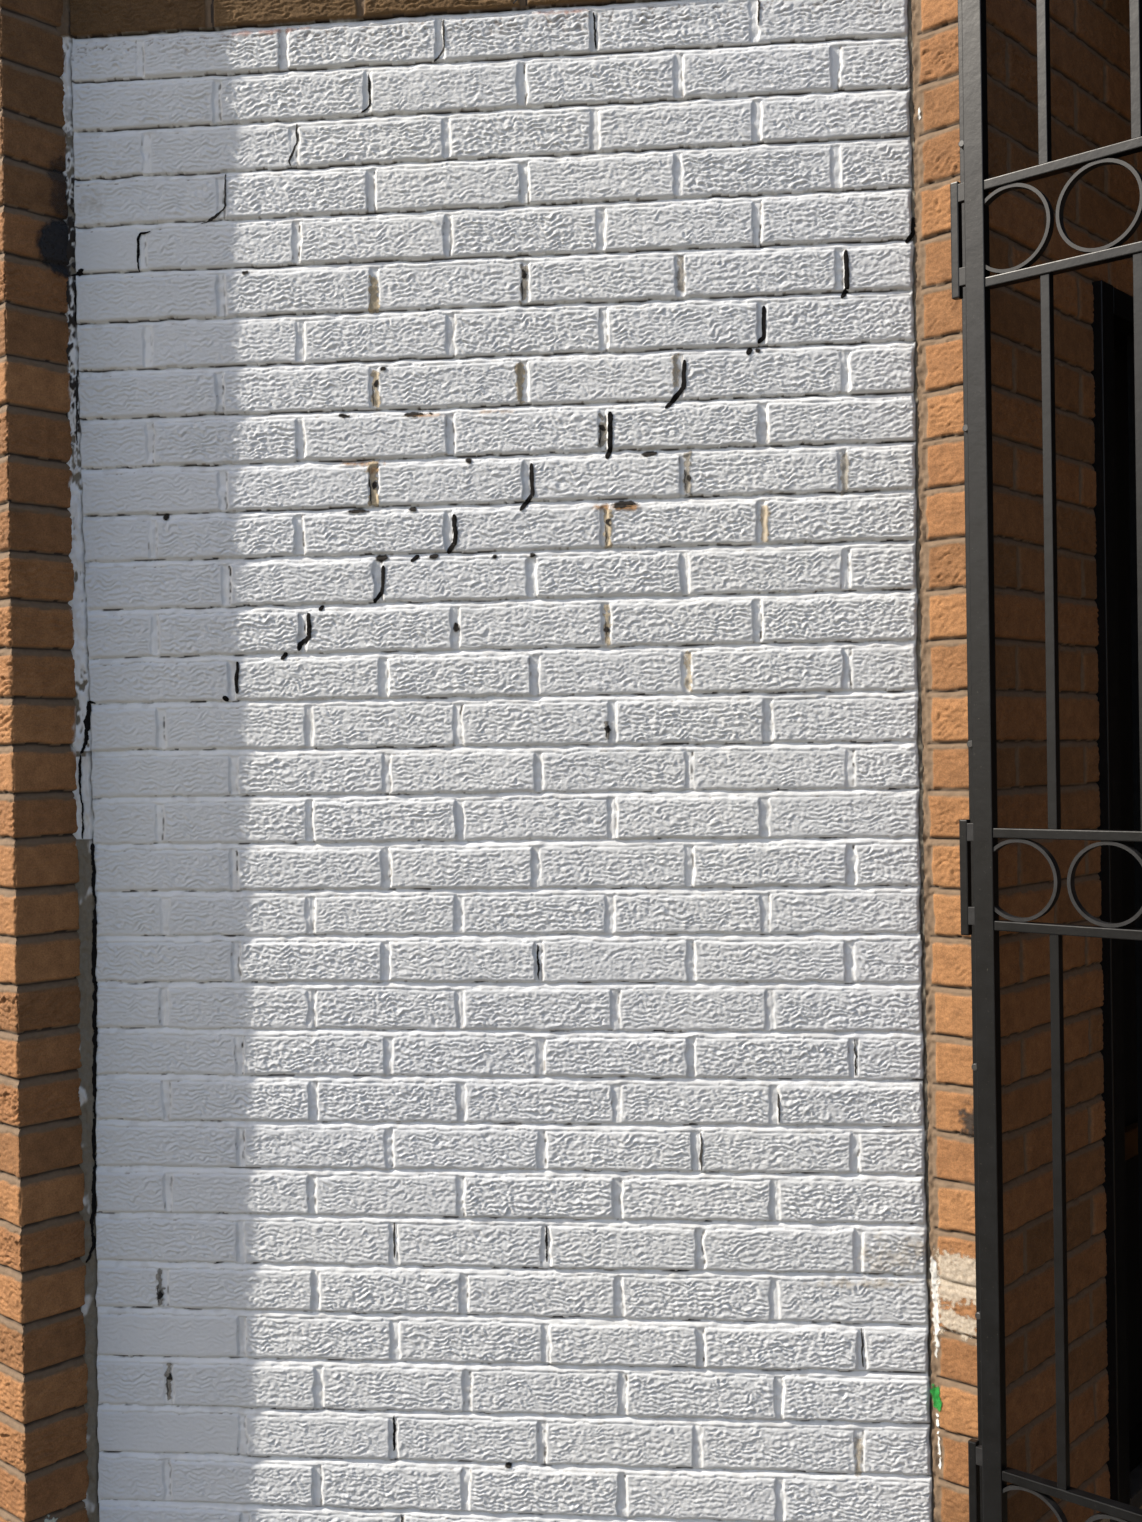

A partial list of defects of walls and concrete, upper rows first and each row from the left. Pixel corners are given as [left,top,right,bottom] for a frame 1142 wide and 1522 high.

crack [288,124,298,168]
crack [137,231,150,272]
crack [841,250,850,299]
crack [905,217,916,243]
crack [746,306,766,355]
crack [665,360,687,409]
crack [605,412,613,459]
crack [520,463,535,511]
crack [373,514,458,603]
crack [281,605,324,660]
crack [222,662,239,702]
crack [78,701,98,1263]